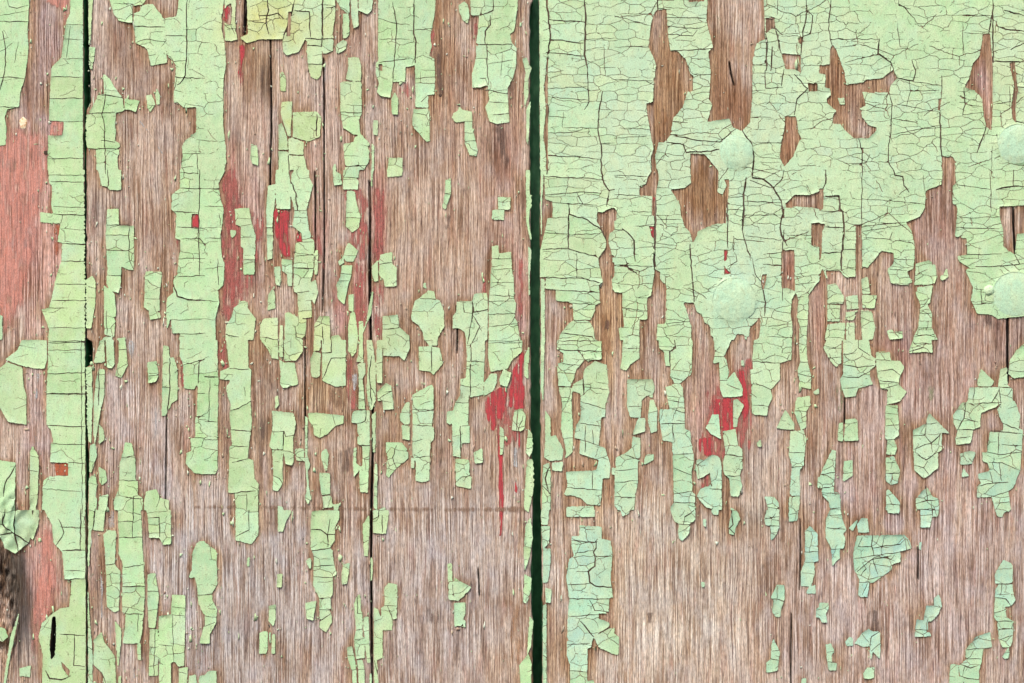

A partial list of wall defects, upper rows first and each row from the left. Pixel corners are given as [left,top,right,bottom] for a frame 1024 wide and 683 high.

crack [241,0,249,34]
crack [267,39,275,185]
peeling [0,0,218,683]
peeling [110,0,529,632]
crack [315,182,325,289]
crack [366,207,374,359]
peeling [459,0,1024,683]
crack [1003,318,1011,381]
crack [1009,209,1017,252]
crack [368,389,376,663]
peeling [259,604,276,654]
peeling [347,583,398,683]